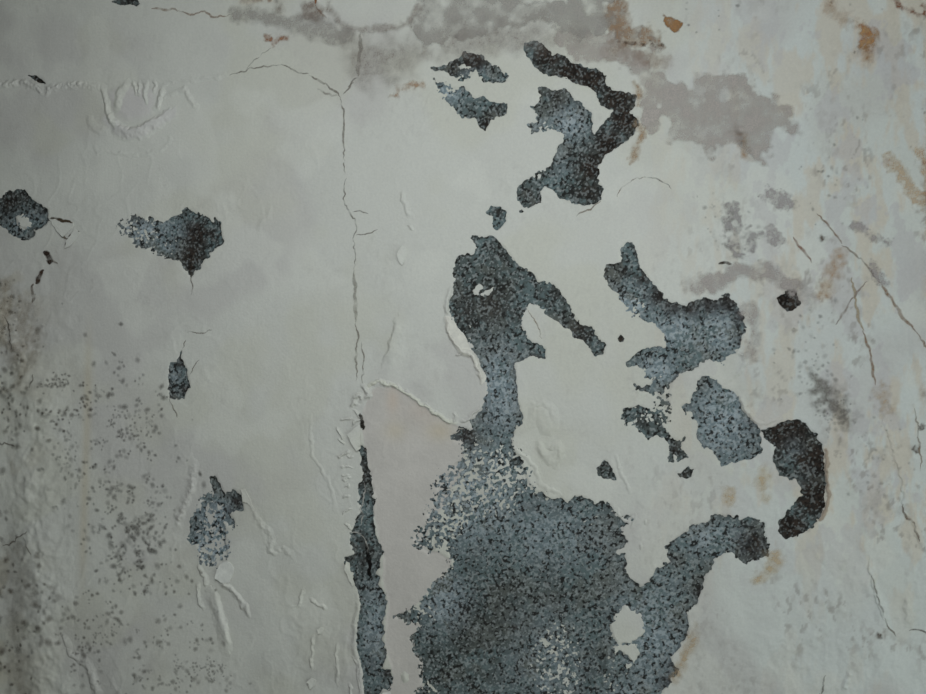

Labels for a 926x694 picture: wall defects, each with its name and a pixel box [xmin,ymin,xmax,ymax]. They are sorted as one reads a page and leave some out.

damp [232,2,351,44]
crack [238,47,376,264]
damp [409,0,521,45]
spalling [517,40,639,213]
rust [605,0,663,47]
damp [525,0,796,165]
rust [664,17,683,33]
spalling [117,207,224,277]
crack [355,325,365,383]
spalling [334,206,770,694]
spalling [603,242,832,539]
crack [817,214,925,385]